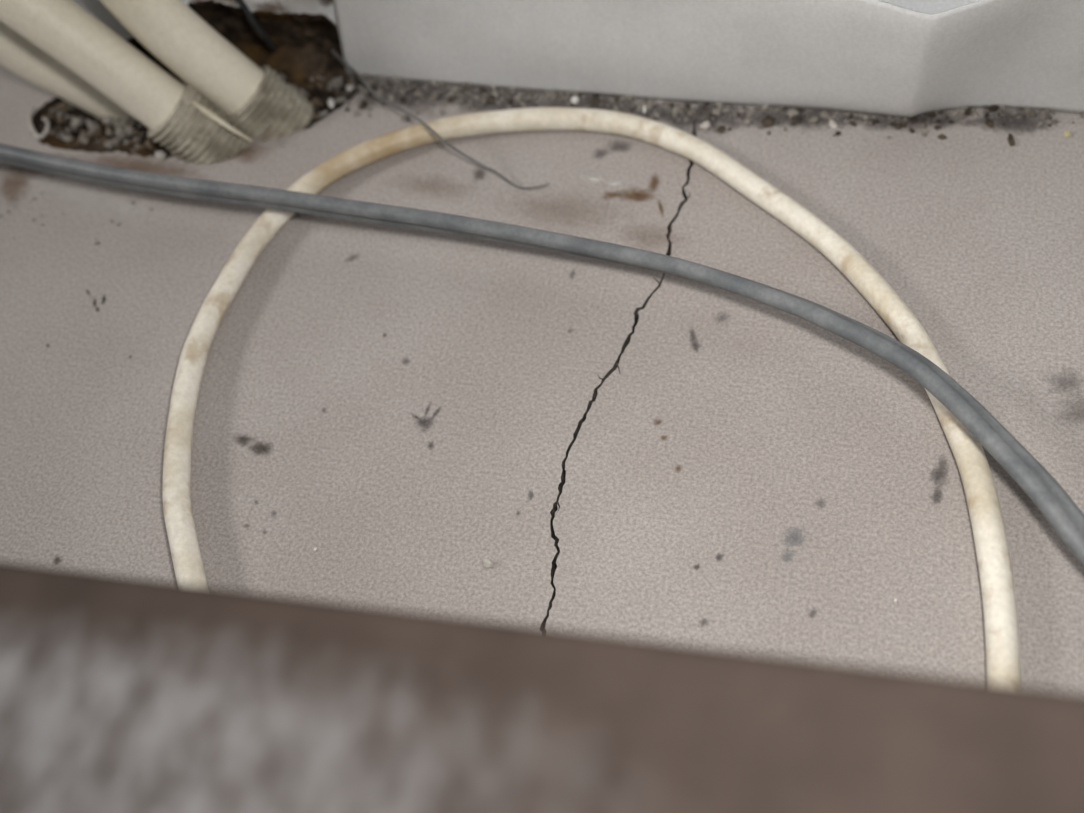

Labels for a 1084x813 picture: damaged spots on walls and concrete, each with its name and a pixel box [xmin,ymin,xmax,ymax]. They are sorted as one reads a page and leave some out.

spalling [28,97,176,161]
spalling [126,37,179,80]
spalling [188,0,365,129]
crack [540,124,697,628]